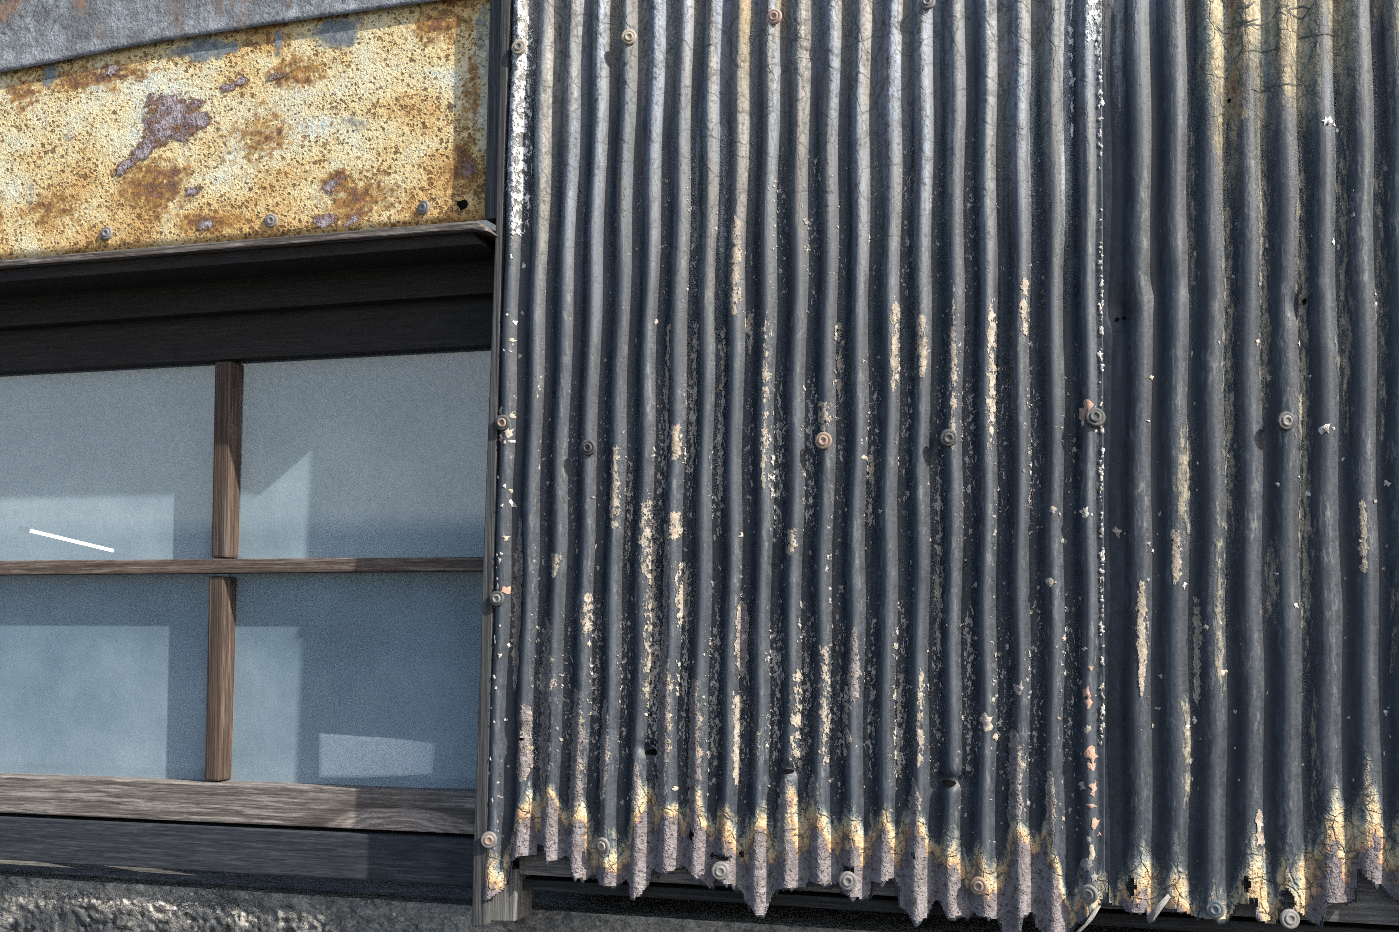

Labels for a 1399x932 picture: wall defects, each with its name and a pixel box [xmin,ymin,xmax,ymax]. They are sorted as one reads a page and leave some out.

corrosion [1,59,157,116]
corrosion [218,50,332,179]
corrosion [1199,0,1355,179]
corrosion [118,148,241,236]
corrosion [311,167,400,225]
peeling [1256,127,1272,400]
peeling [1265,117,1356,667]
peeling [1147,130,1238,808]
peeling [1344,480,1391,580]
peeling [1132,578,1162,696]
corrosion [483,757,1399,932]
peeling [1255,809,1265,846]